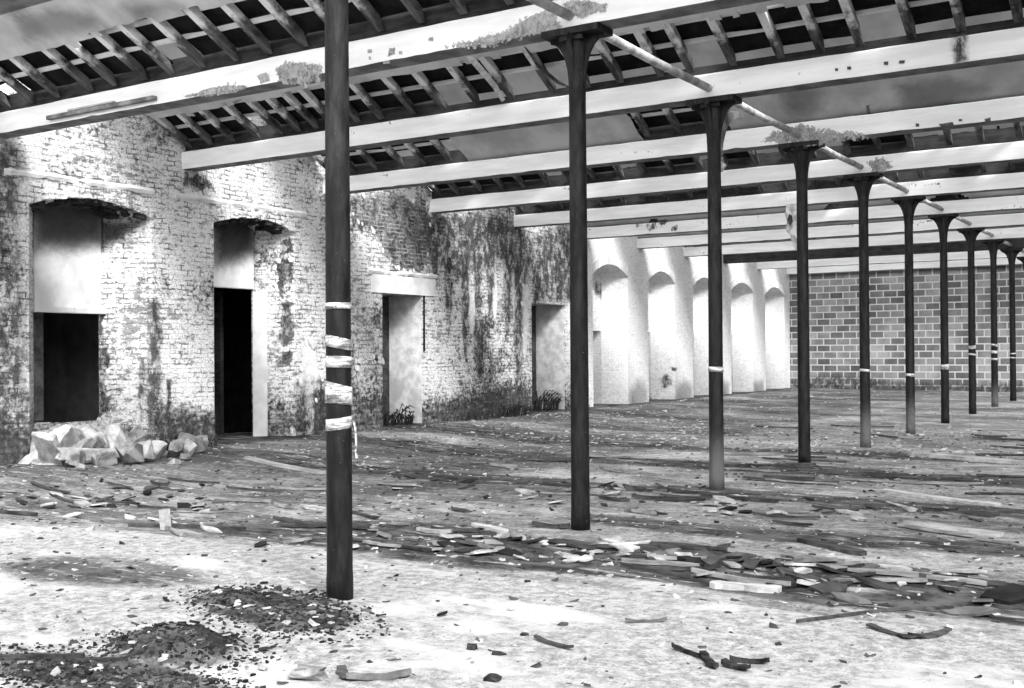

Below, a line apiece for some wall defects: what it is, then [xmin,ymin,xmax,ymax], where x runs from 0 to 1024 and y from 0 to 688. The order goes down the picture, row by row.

damp [952,33,967,63]
flaking render [180,168,213,198]
damp [0,145,31,465]
spalling [96,314,112,422]
flaking render [213,217,326,435]